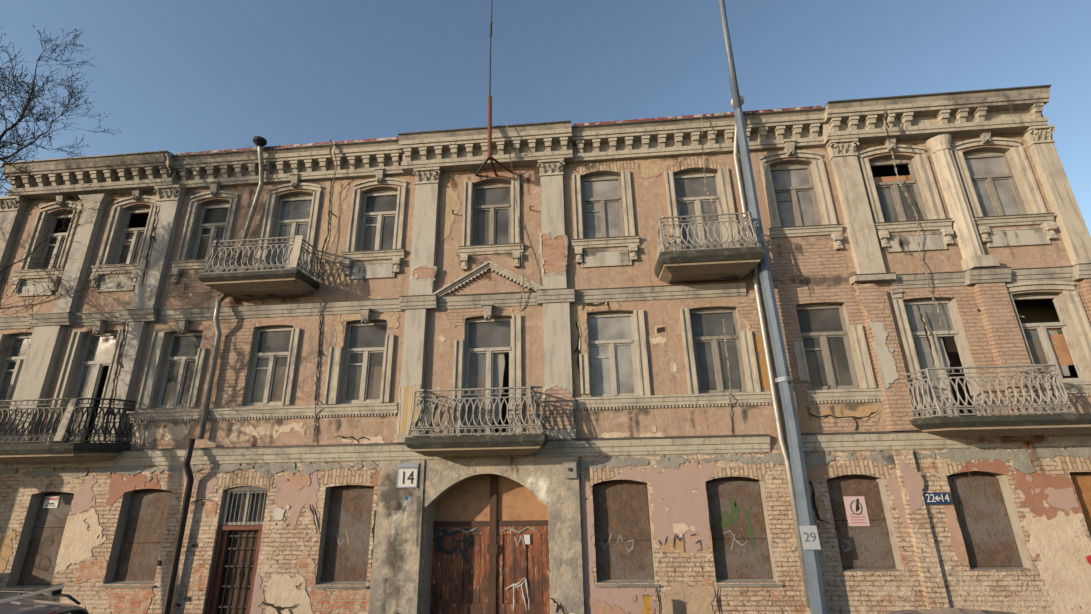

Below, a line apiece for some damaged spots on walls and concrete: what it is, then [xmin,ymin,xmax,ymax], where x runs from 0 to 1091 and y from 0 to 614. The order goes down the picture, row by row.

flaking render [537,231,568,278]
flaking render [646,325,668,346]
flaking render [736,242,1003,393]
flaking render [1063,281,1091,326]
flaking render [541,301,620,444]
peeling [132,421,190,445]
flaking render [341,383,421,444]
peeling [600,426,663,438]
peeling [796,405,880,433]
peeling [0,460,380,614]
peeling [578,453,791,614]
peeling [804,445,1091,614]